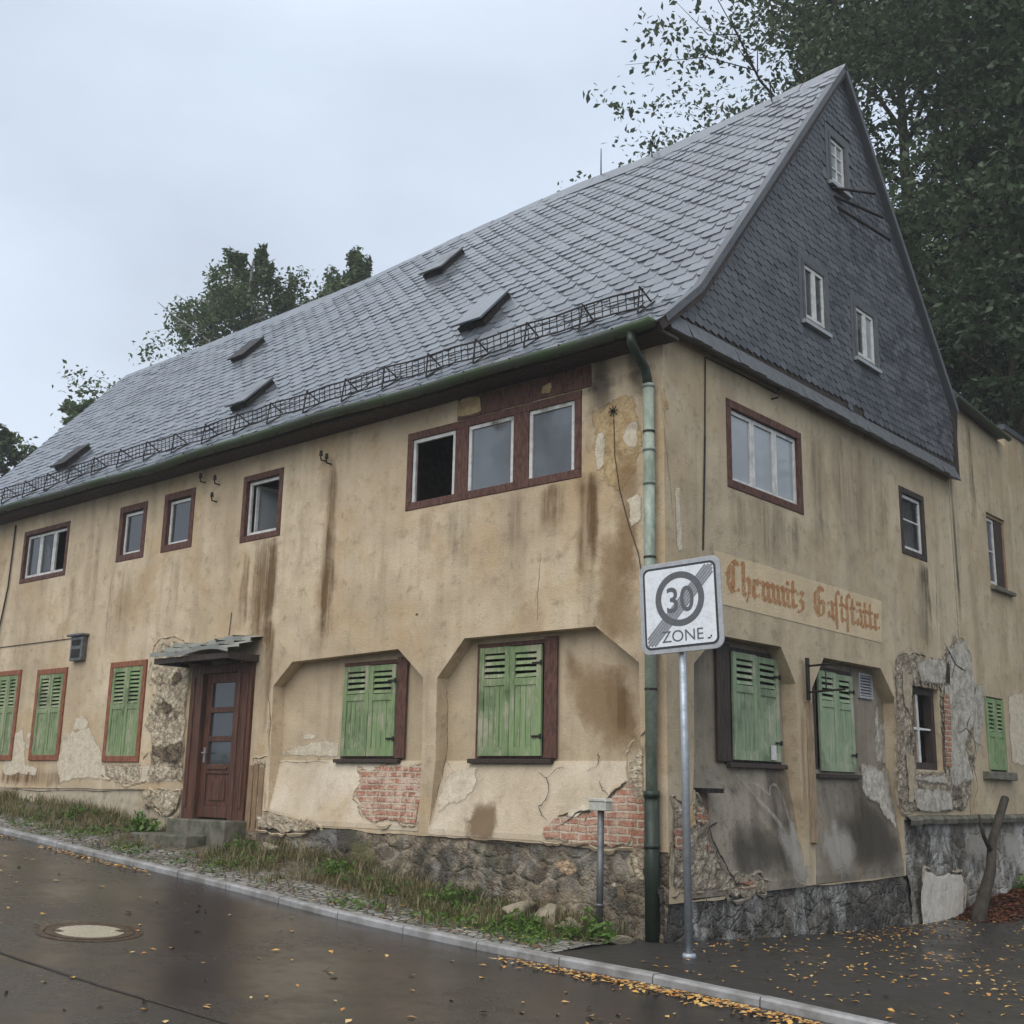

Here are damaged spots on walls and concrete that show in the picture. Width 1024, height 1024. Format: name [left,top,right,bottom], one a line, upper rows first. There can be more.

peeling [592,395,643,526]
damp [245,545,276,659]
damp [321,566,333,626]
peeling [3,729,37,776]
spalling [56,634,192,818]
spalling [352,762,421,829]
damp [466,806,495,837]
crack [430,685,631,854]
spalling [540,730,645,880]
damp [736,825,799,872]
damp [832,799,894,860]
spalling [861,629,984,828]